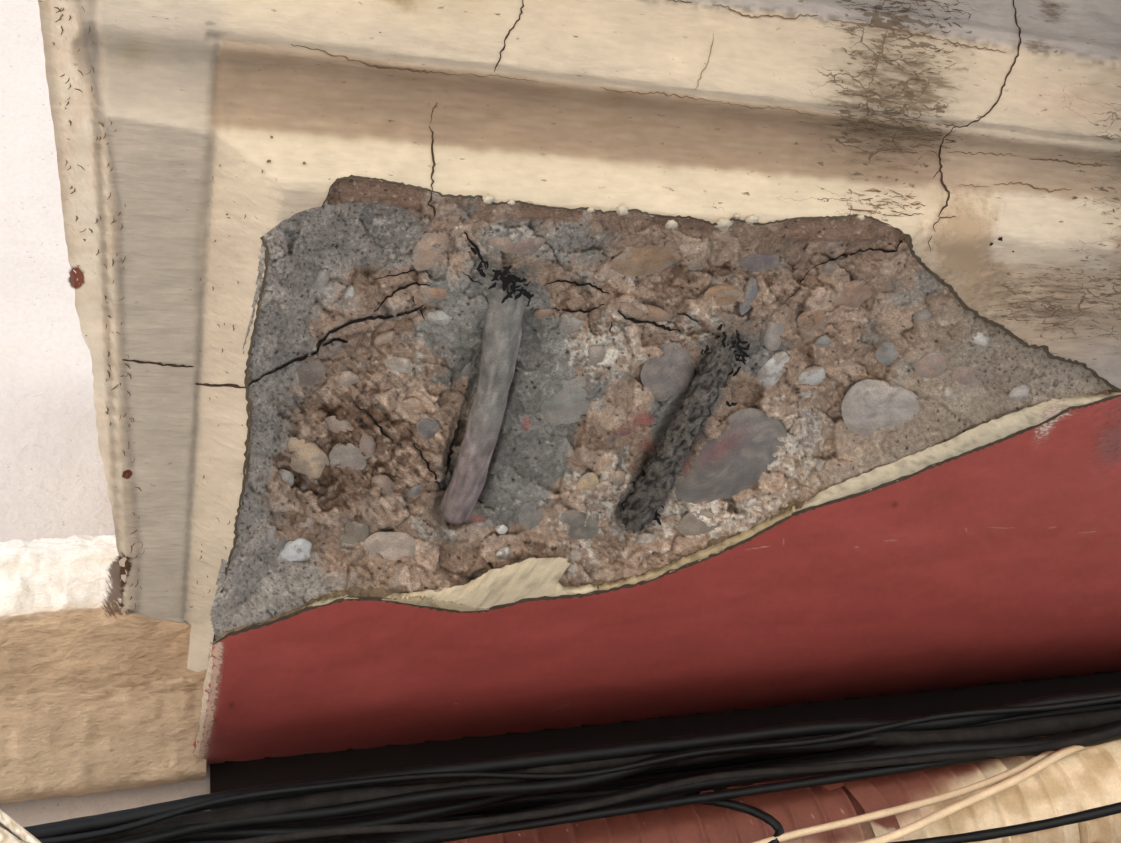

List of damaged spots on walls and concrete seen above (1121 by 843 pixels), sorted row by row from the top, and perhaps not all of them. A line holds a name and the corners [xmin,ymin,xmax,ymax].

crack [291,0,537,82]
damp [844,51,955,152]
crack [427,103,437,217]
crack [600,0,1121,336]
crack [462,232,487,285]
crack [122,269,432,389]
crack [358,406,461,489]
spalling [193,171,1121,759]